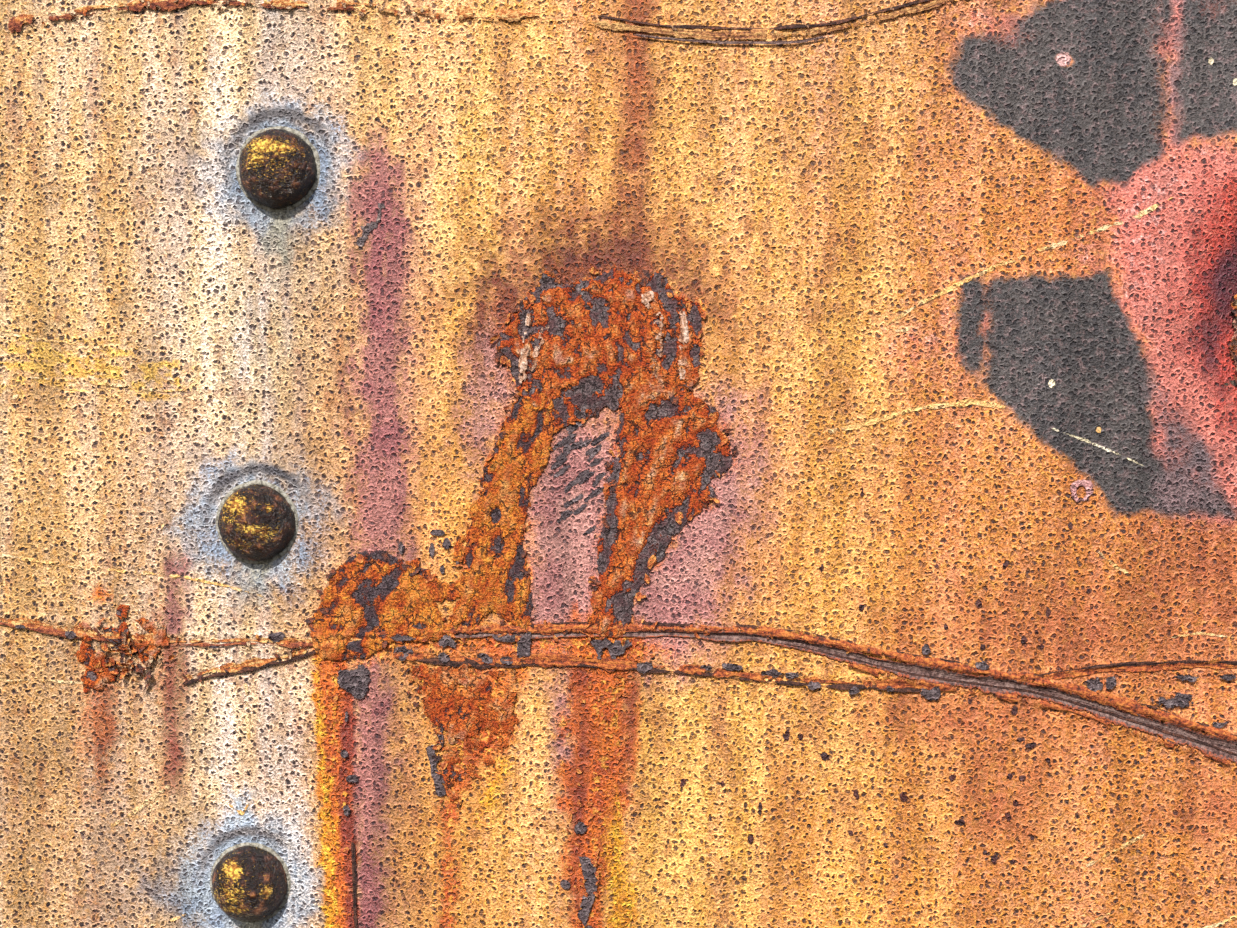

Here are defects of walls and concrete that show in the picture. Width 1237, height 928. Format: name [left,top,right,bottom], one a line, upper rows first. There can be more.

crack [8,0,953,45]
rust [0,531,206,928]
crack [0,617,316,685]
rust [304,0,816,928]
crack [348,619,1237,765]
rust [739,512,1237,928]